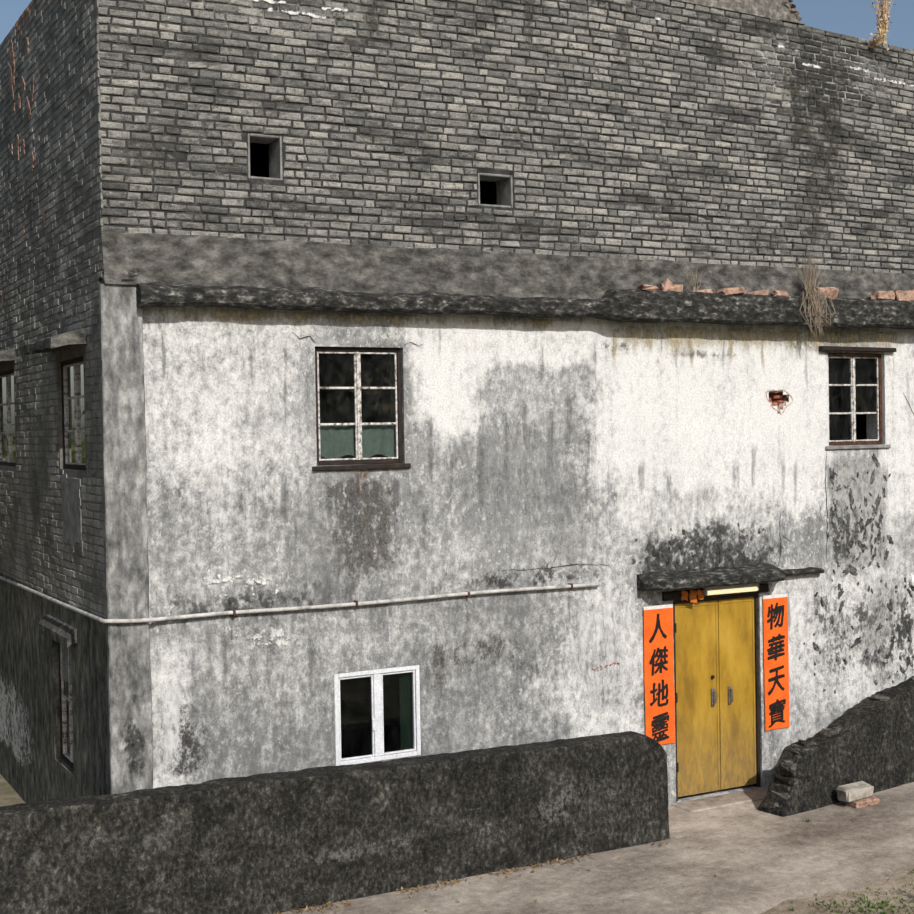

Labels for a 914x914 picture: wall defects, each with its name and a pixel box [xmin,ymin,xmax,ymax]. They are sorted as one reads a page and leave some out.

water stain [605,327,894,362]
spalling [765,389,793,414]
water stain [328,479,398,579]
water stain [632,521,782,573]
peeling [827,453,894,613]
water stain [467,572,518,587]
water stain [530,564,576,585]
peeling [841,577,914,683]